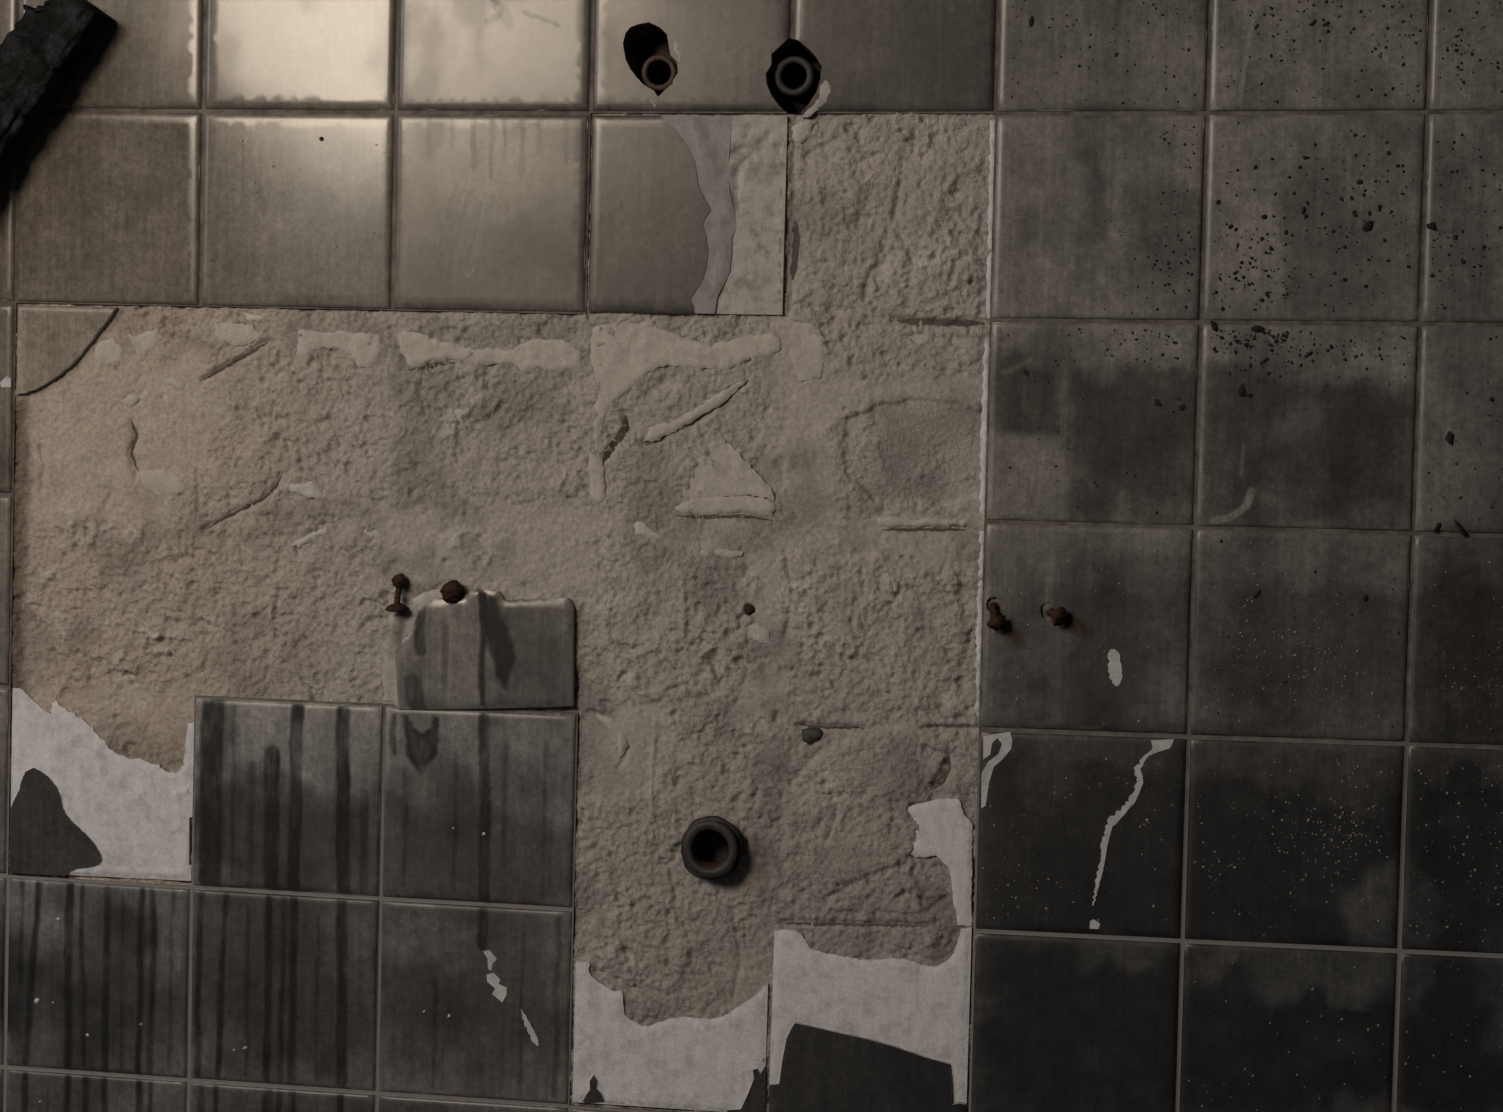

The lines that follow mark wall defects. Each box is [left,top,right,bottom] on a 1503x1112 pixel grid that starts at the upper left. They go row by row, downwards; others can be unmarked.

leakage [1023,328,1179,403]
leakage [26,882,40,1032]
leakage [66,883,83,935]
leakage [65,955,108,1112]
leakage [135,888,156,1101]
leakage [199,701,223,885]
leakage [265,704,304,964]
leakage [336,706,350,1024]
leakage [394,696,438,773]
leakage [415,616,425,652]
leakage [478,591,514,841]
spalling [0,24,1012,1112]